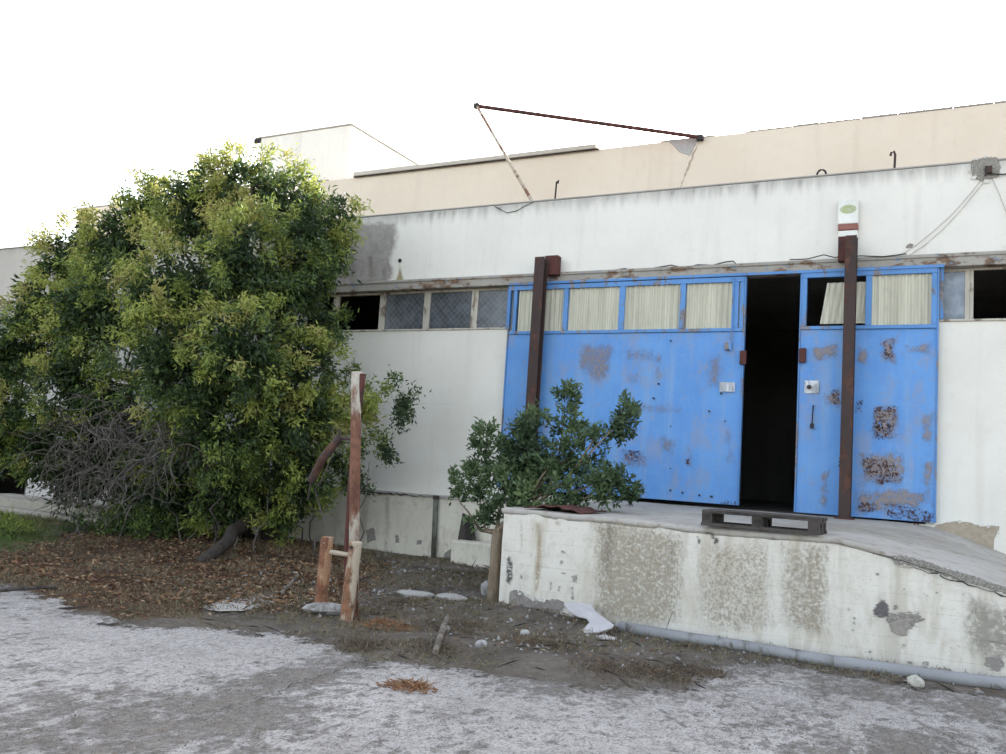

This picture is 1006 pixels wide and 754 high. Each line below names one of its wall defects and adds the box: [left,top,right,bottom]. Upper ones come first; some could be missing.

leakage [335,224,395,283]
corrosion [855,400,897,440]
corrosion [862,457,903,484]
corrosion [858,502,935,525]
spalling [935,520,1000,549]
leakage [698,532,764,625]
leakage [785,549,824,631]
leakage [969,605,1006,657]